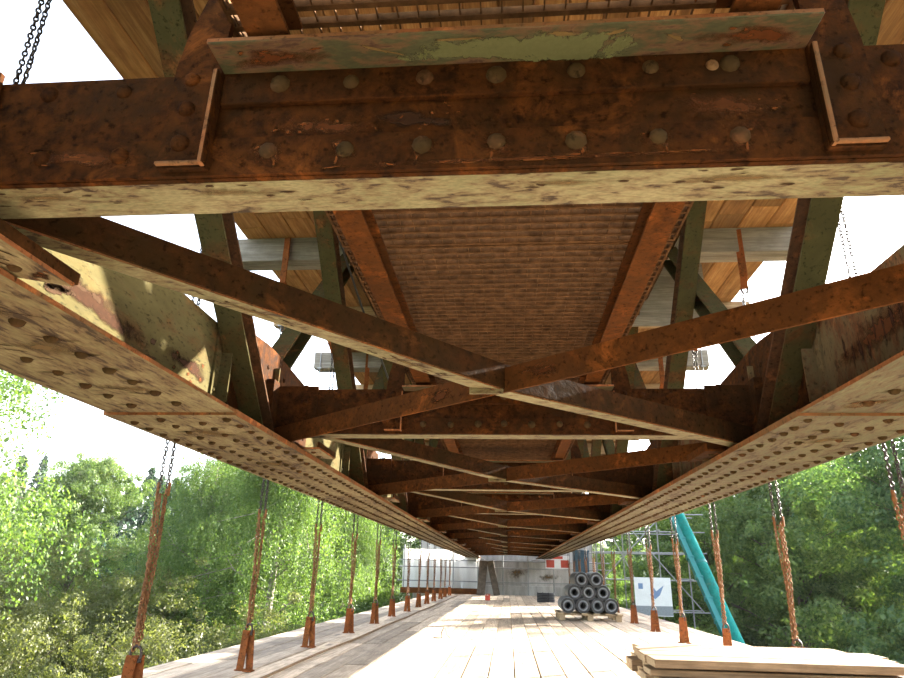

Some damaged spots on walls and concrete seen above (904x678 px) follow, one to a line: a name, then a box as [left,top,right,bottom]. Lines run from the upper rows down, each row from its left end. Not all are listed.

peeling [361,29,637,62]
rust [681,93,761,114]
rust [272,118,354,169]
rust [411,133,711,164]
rust [835,303,904,365]
rust [171,350,204,383]